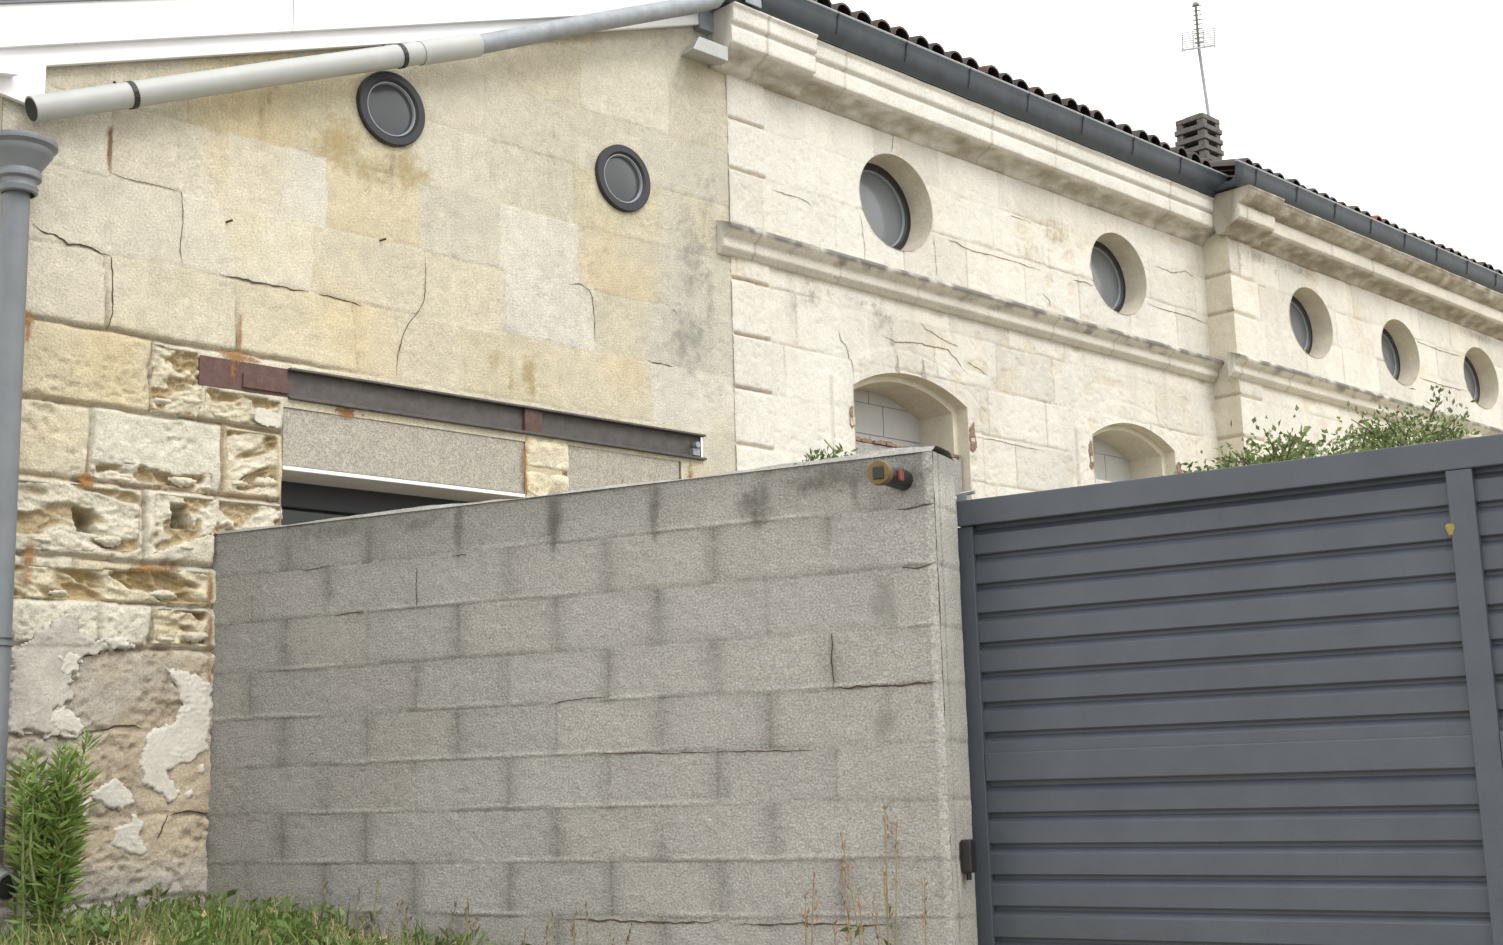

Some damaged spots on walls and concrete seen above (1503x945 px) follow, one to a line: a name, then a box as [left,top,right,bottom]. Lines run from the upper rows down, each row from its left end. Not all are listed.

crack [111,172,183,265]
crack [33,224,114,328]
crack [397,256,426,362]
flaking render [83,667,213,856]